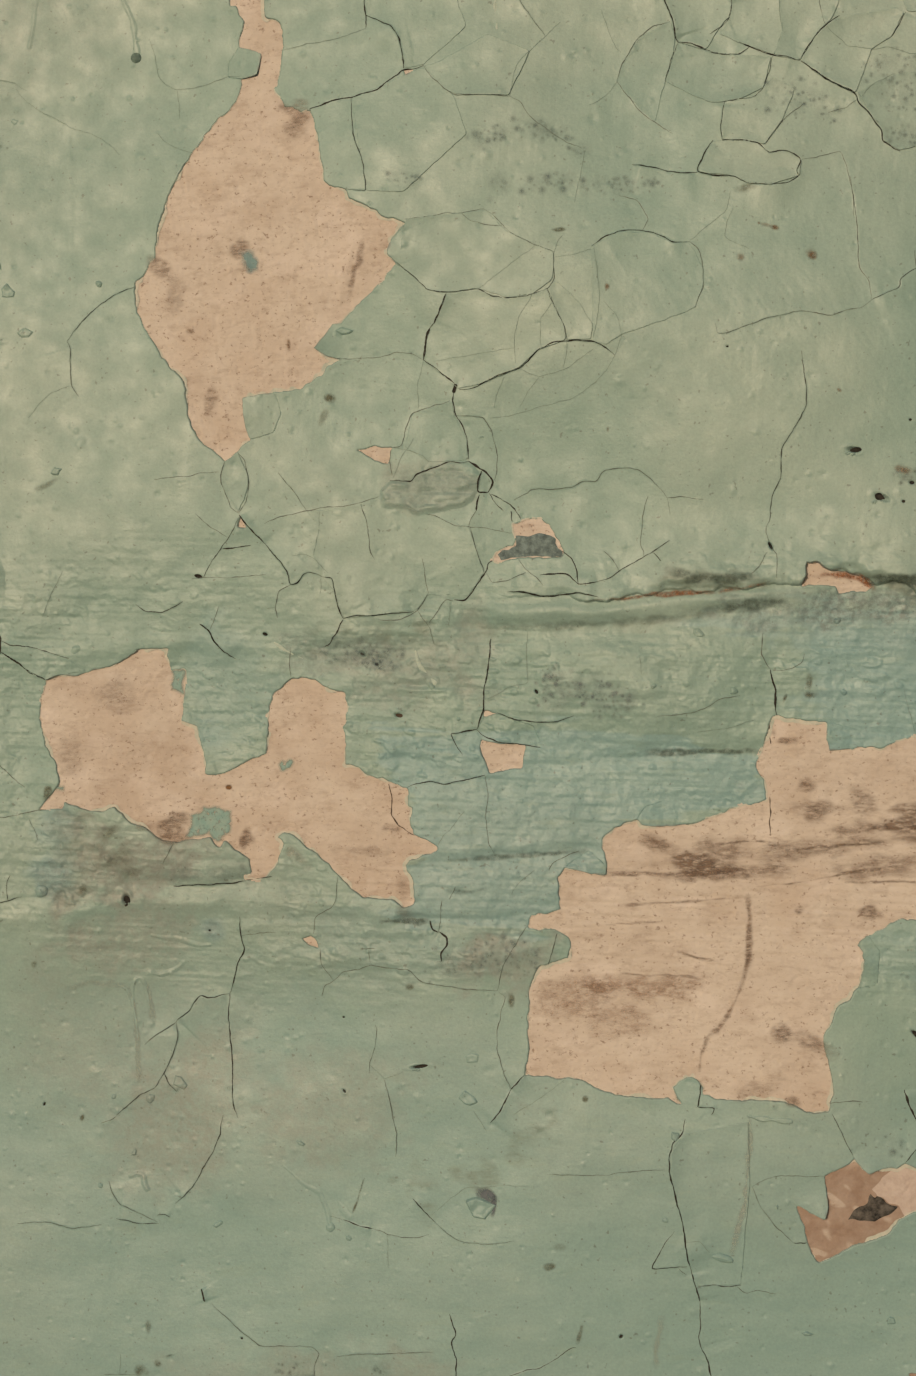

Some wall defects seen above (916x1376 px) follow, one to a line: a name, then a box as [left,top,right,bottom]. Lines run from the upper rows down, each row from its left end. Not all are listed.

peeling [135,0,703,461]
crack [138,0,916,658]
peeling [308,498,564,617]
peeling [1,641,437,907]
crack [17,917,273,1229]
crack [201,1289,457,1375]
crack [369,1026,402,1157]
crack [313,879,564,1130]
crack [330,1085,774,1376]
peeling [525,715,916,1113]
peeling [776,1145,916,1262]
crack [904,1090,916,1163]